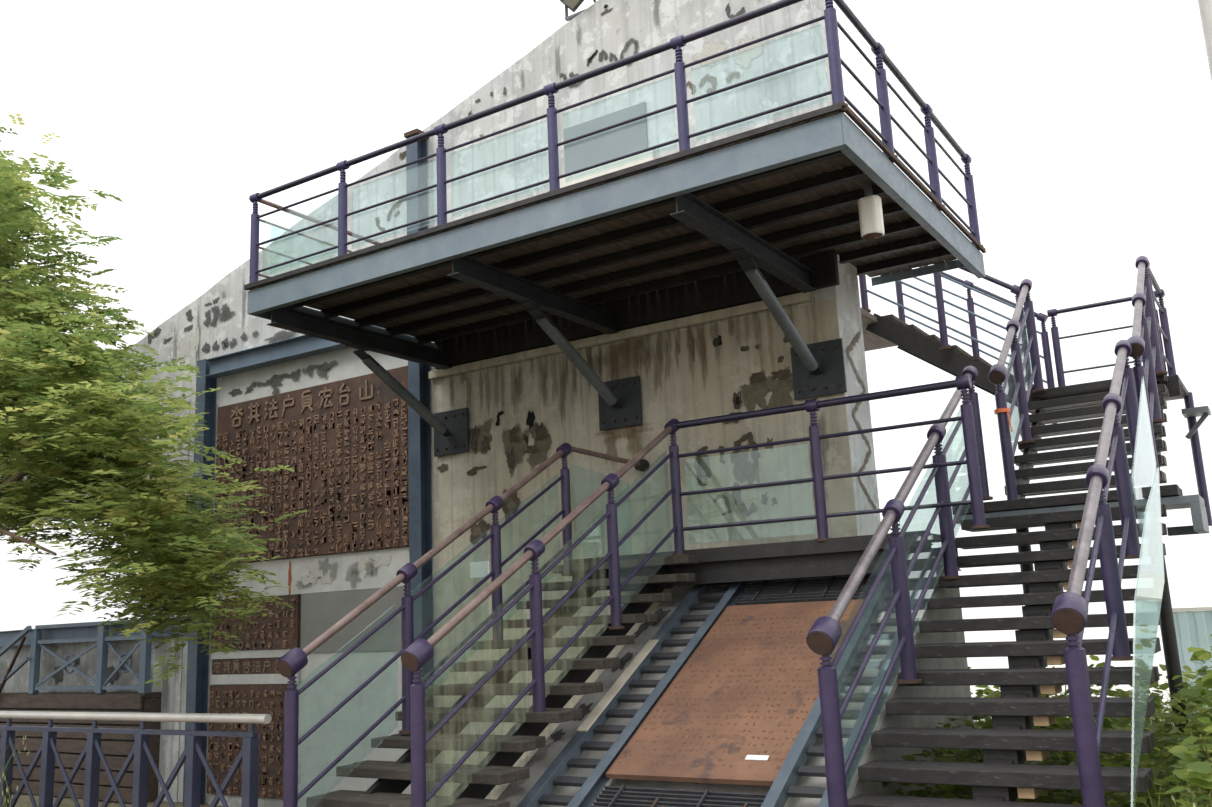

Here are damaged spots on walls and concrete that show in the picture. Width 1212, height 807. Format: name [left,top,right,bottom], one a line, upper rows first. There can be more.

peeling [560,38,638,88]
peeling [147,297,296,354]
peeling [228,360,337,397]
spalling [467,411,552,476]
spalling [694,369,794,518]
peeling [502,490,520,520]
peeling [470,519,490,544]